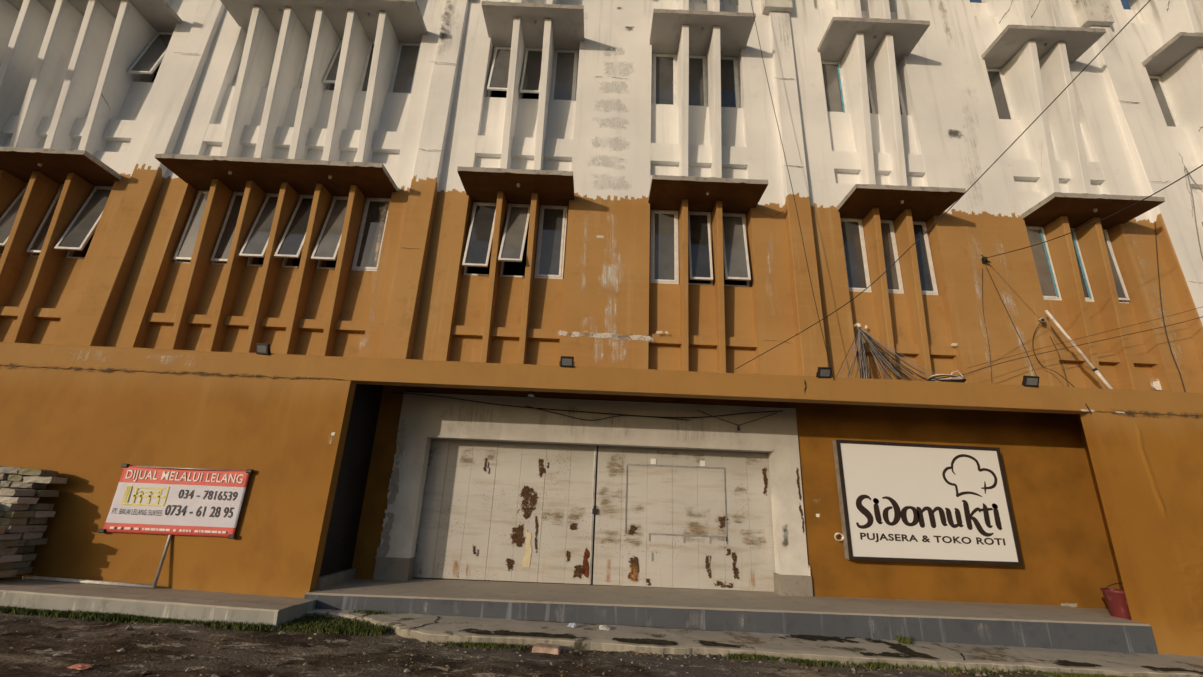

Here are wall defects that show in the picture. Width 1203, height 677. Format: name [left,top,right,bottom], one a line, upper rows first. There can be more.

spalling [375,420,407,559]
rust [566,549,590,579]
rust [627,525,651,586]
rust [705,516,765,588]